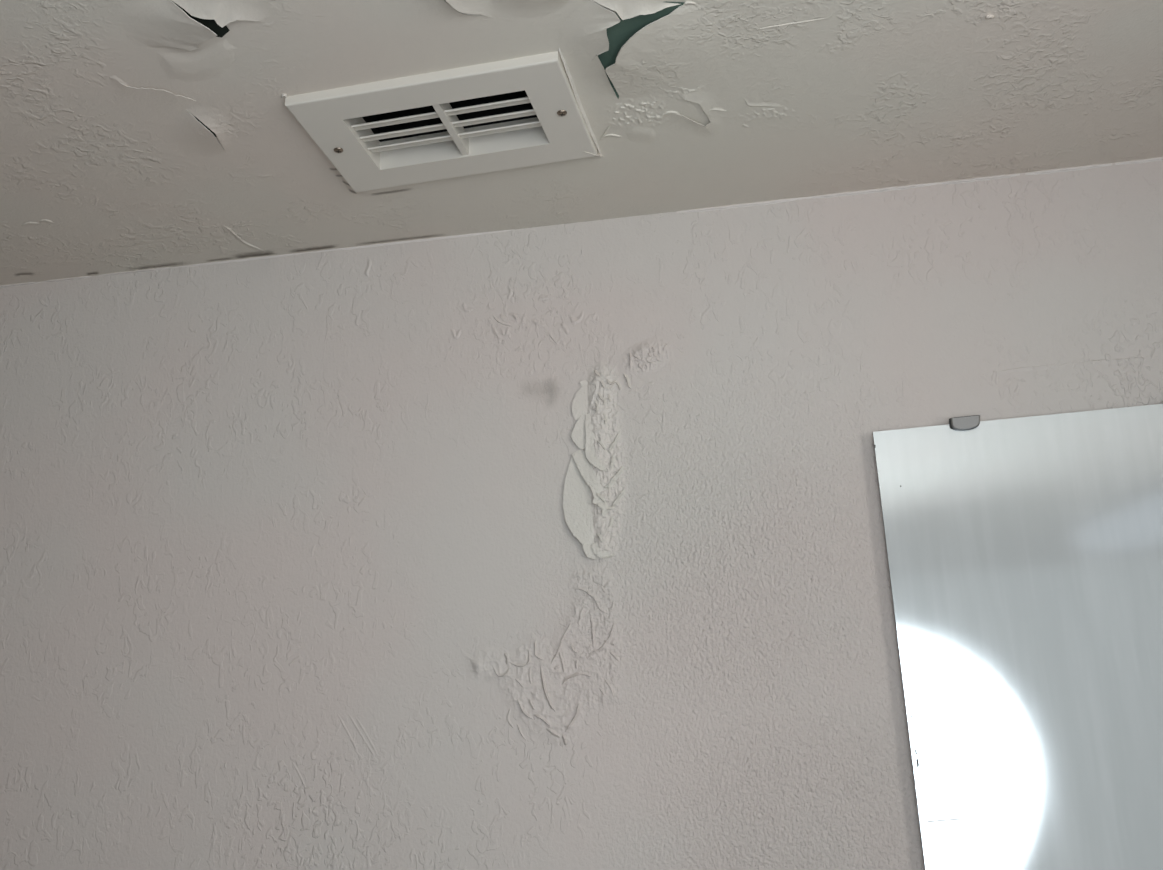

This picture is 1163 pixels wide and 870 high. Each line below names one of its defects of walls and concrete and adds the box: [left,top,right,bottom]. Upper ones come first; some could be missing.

peeling [109,0,272,157]
peeling [403,0,751,99]
peeling [558,360,632,565]